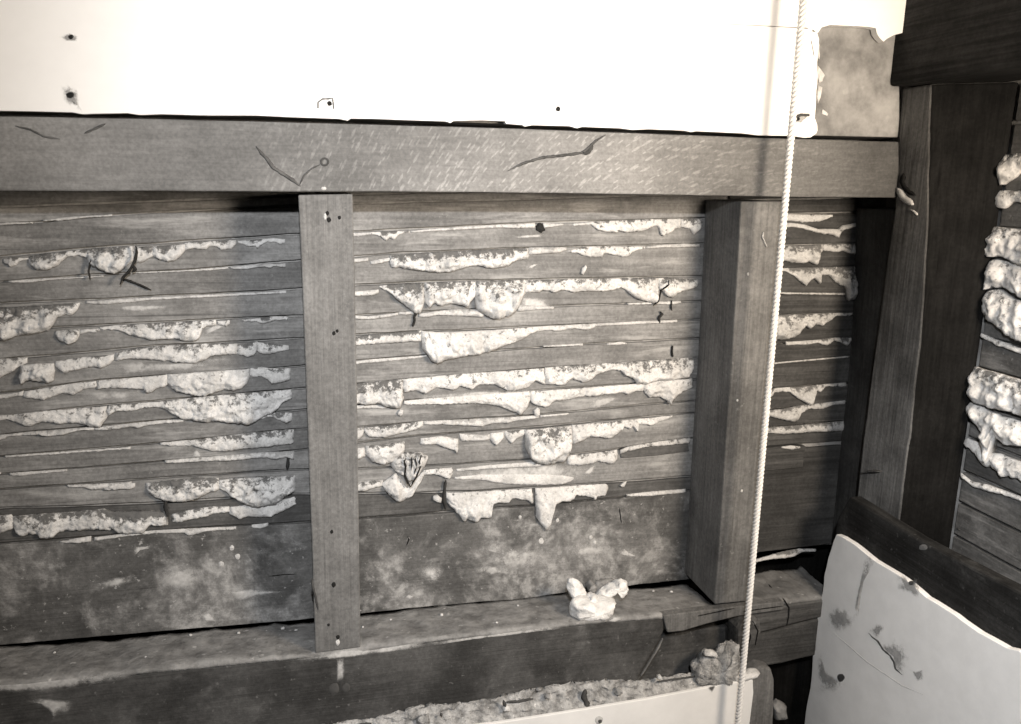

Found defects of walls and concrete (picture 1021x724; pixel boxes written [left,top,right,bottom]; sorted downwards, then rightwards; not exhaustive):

crack [256,146,319,187]
crack [508,135,605,171]
leakage [856,565,869,609]
leakage [831,611,850,627]
leakage [820,663,836,686]